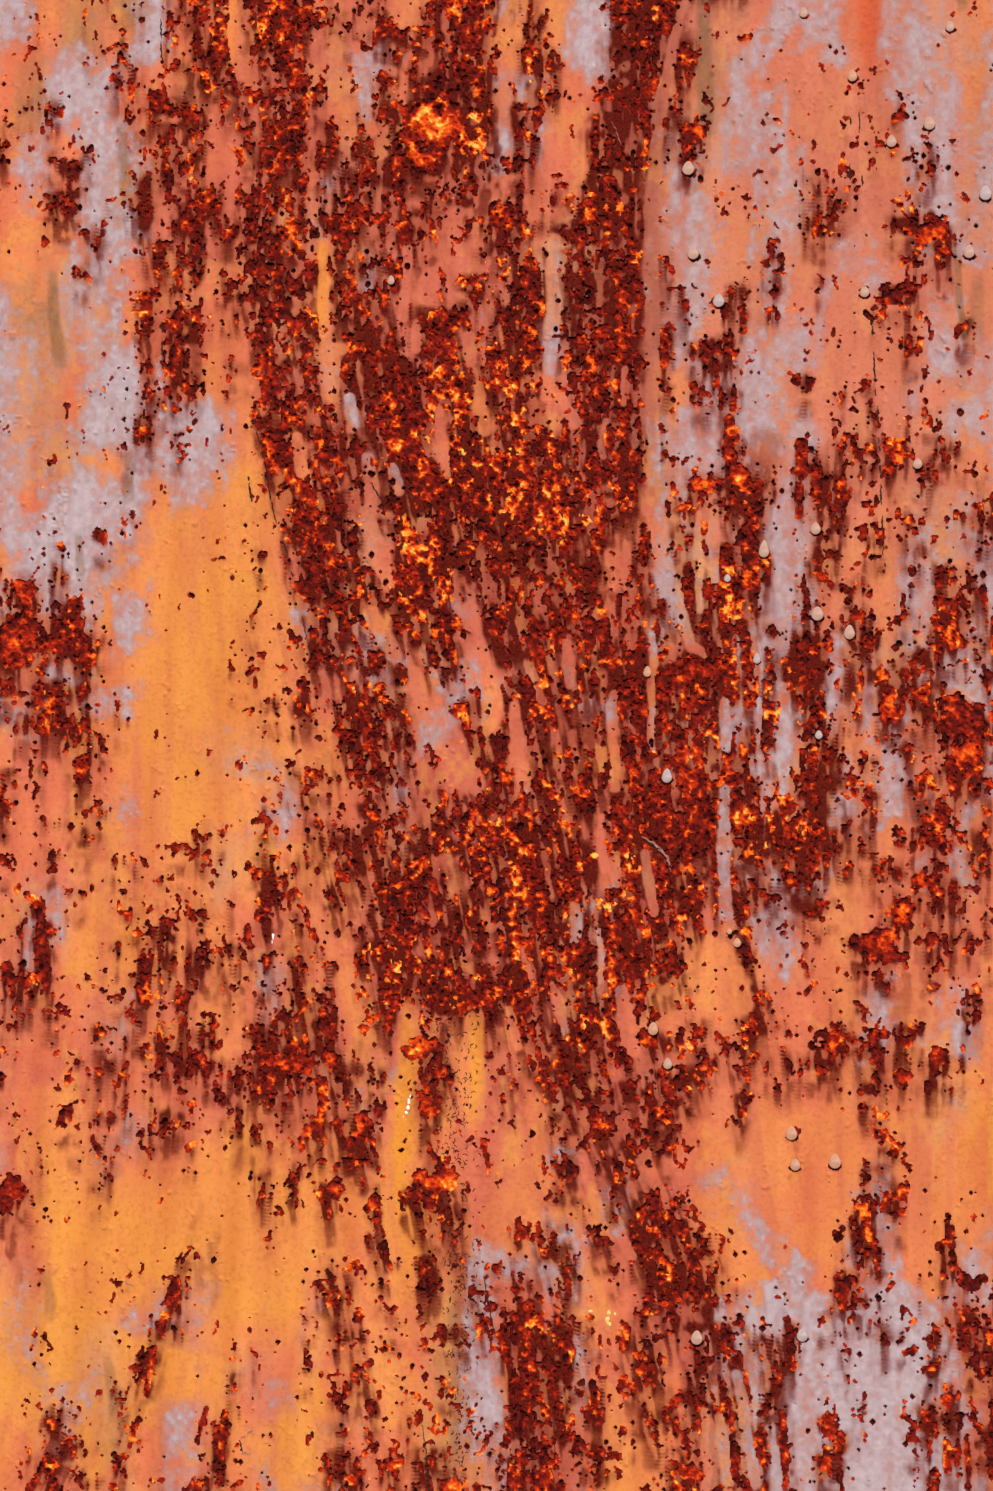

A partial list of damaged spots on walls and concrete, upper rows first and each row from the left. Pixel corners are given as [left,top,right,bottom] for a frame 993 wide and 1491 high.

rust [711,29,753,41]
rust [340,63,358,94]
rust [713,179,768,227]
rust [220,354,238,399]
rust [119,491,142,549]
rust [241,539,268,632]
rust [227,640,271,689]
rust [153,748,213,798]
rust [225,755,248,781]
rust [152,815,241,889]
rust [4,1240,281,1491]
rust [294,1395,314,1447]